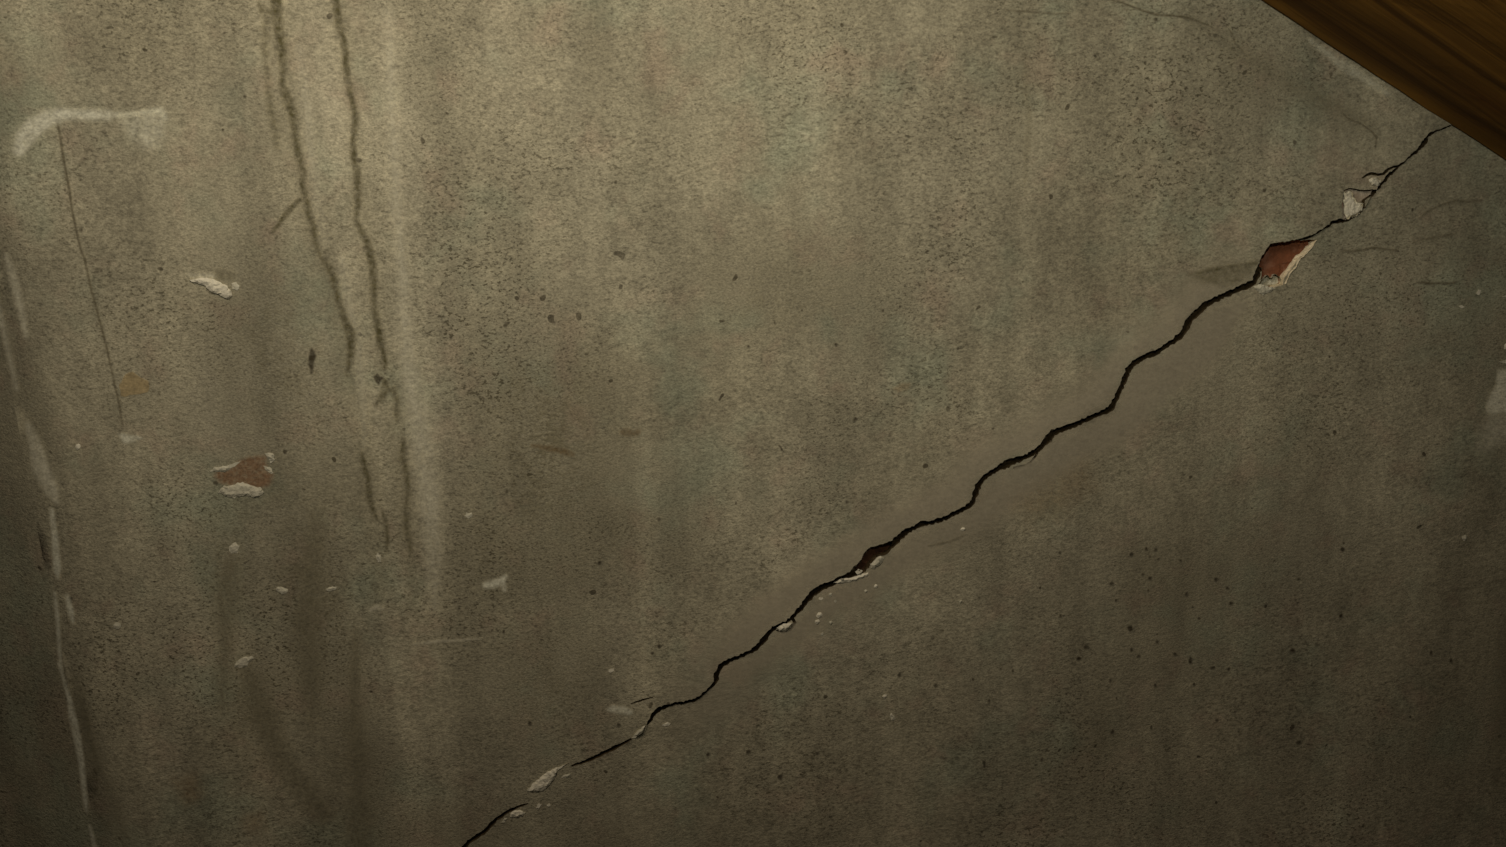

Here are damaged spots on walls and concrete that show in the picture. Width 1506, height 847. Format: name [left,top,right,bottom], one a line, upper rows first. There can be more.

spalling [1342,177,1381,220]
crack [1296,114,1482,252]
spalling [1253,239,1317,296]
peeling [209,453,275,499]
crack [571,264,1262,767]
crack [462,803,528,847]